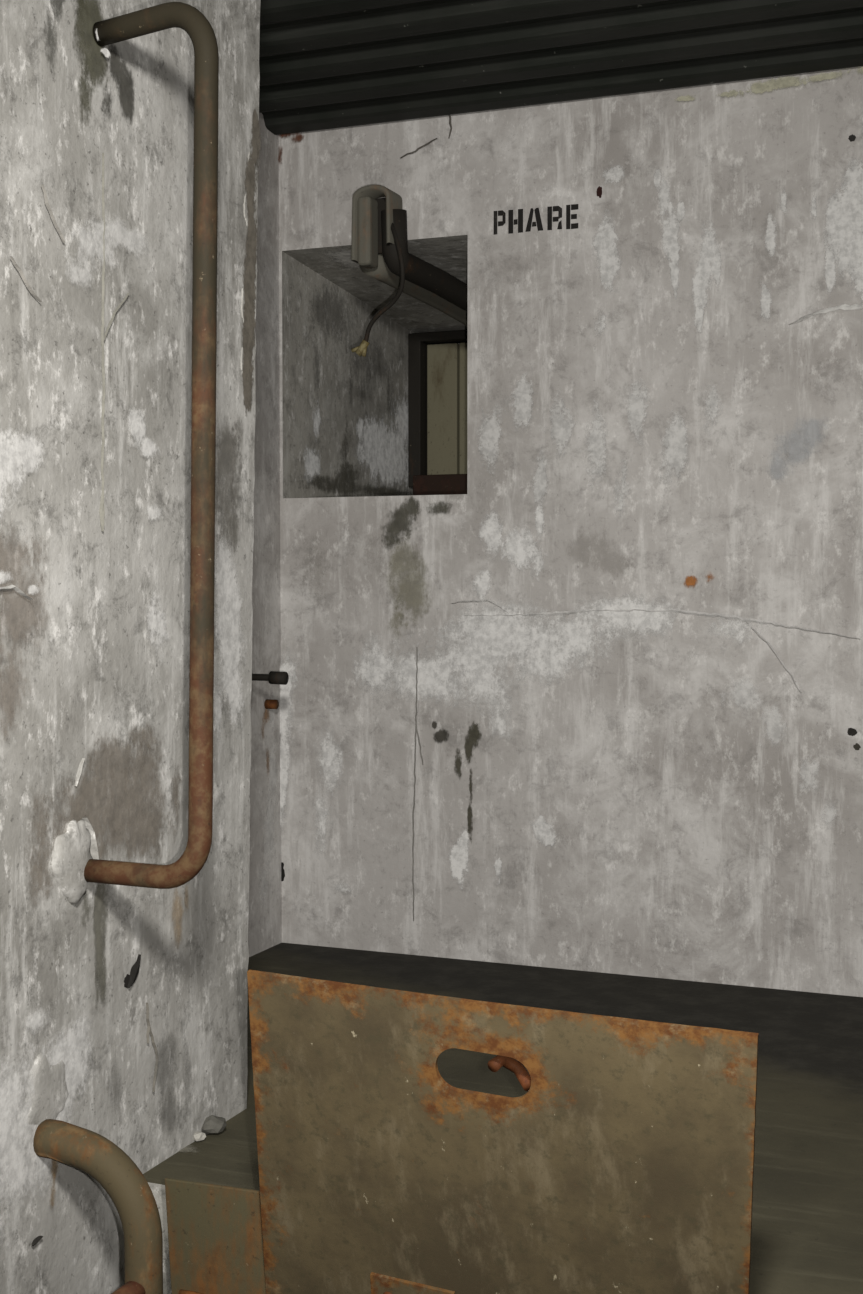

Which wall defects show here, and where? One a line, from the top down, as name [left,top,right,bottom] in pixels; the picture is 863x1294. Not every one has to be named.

rust [684,576,711,587]
leakage [354,594,675,833]
leakage [31,725,178,894]